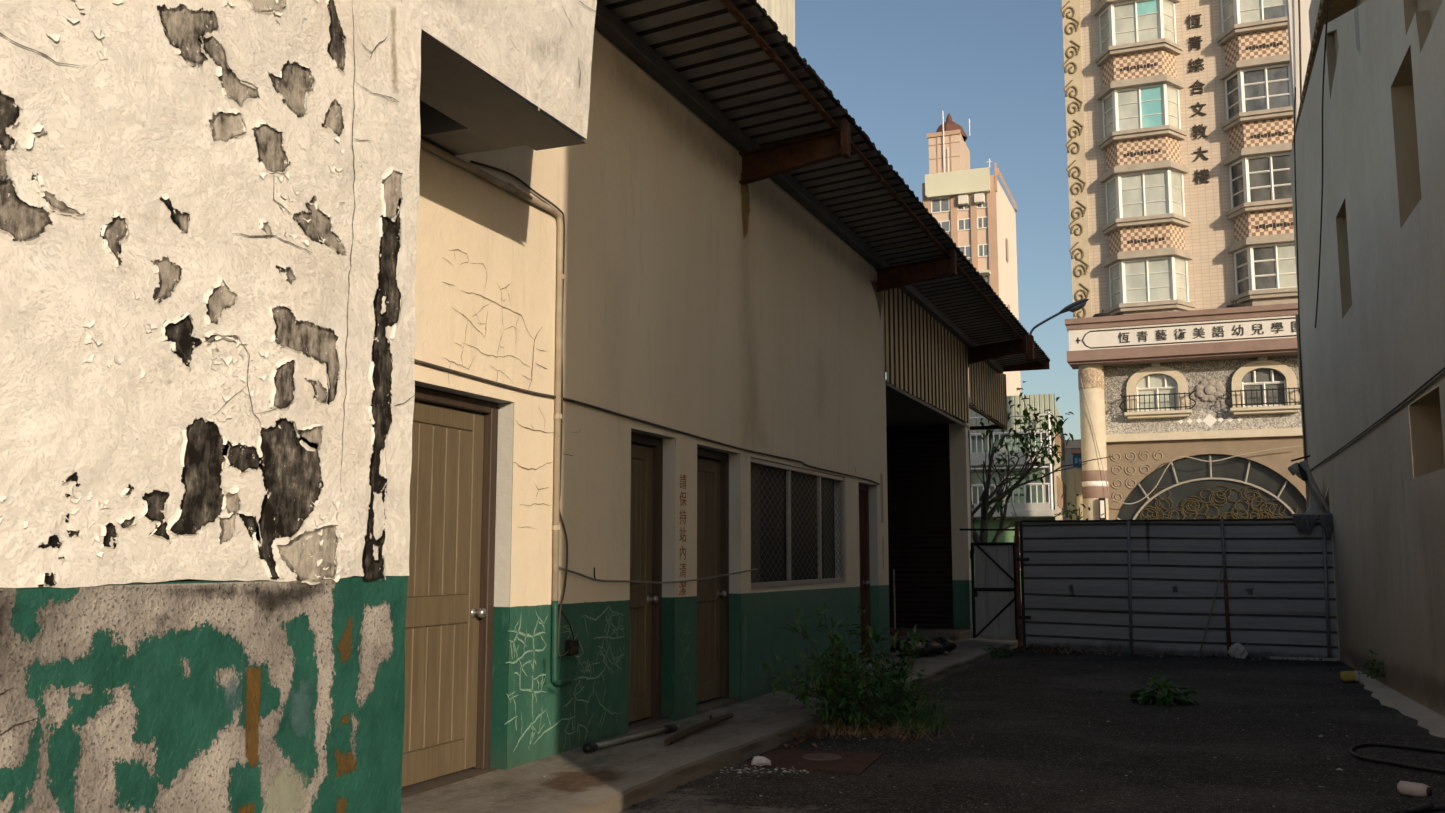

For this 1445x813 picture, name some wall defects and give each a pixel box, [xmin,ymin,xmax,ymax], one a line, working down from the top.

peeling [0,91,85,245]
peeling [100,209,130,267]
peeling [157,0,347,256]
corrosion [741,173,750,236]
peeling [362,165,403,582]
crack [442,249,581,529]
peeling [0,256,344,813]
peeling [350,601,394,761]
crack [504,605,625,752]